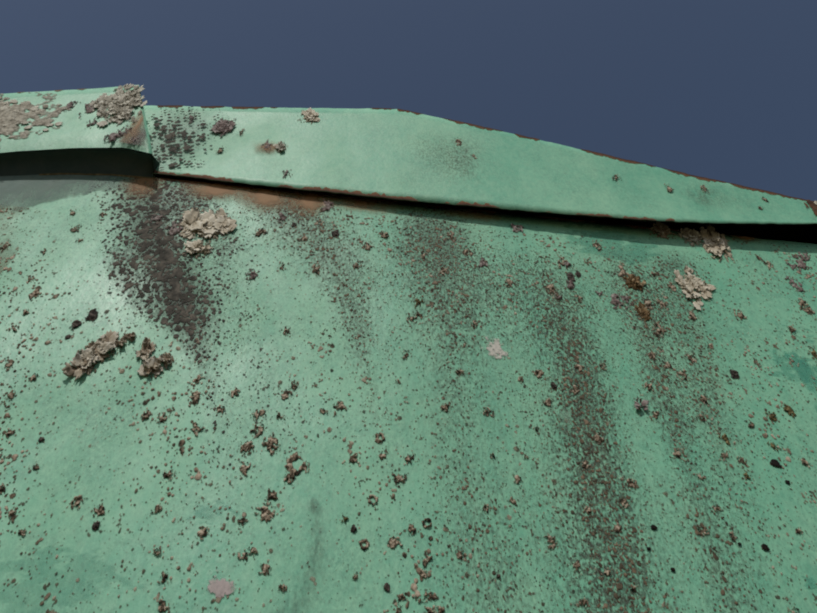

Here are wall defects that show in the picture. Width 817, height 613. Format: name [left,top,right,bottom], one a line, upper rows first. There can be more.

leakage [148,106,231,170]
corrosion [130,170,499,217]
corrosion [581,149,817,215]
leakage [0,174,817,613]